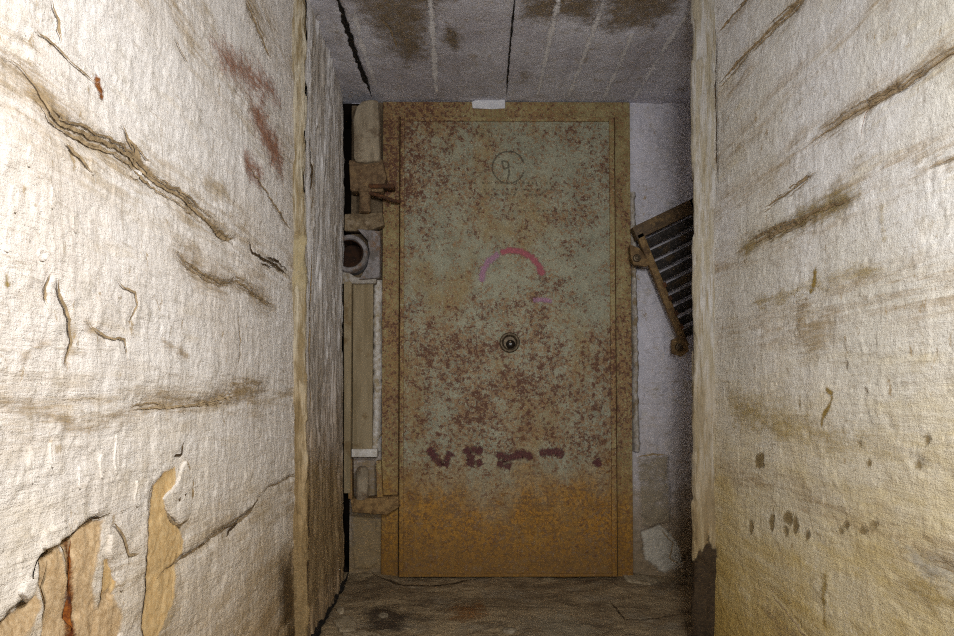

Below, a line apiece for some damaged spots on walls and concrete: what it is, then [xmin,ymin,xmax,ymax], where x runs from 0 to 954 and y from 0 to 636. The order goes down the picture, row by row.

crack [337,0,377,96]
corrosion [216,43,283,174]
crack [307,138,315,190]
corrosion [351,192,383,214]
crack [306,254,314,415]
spalling [0,443,194,636]
crack [158,474,310,583]
crack [311,573,349,636]
crack [372,573,477,586]